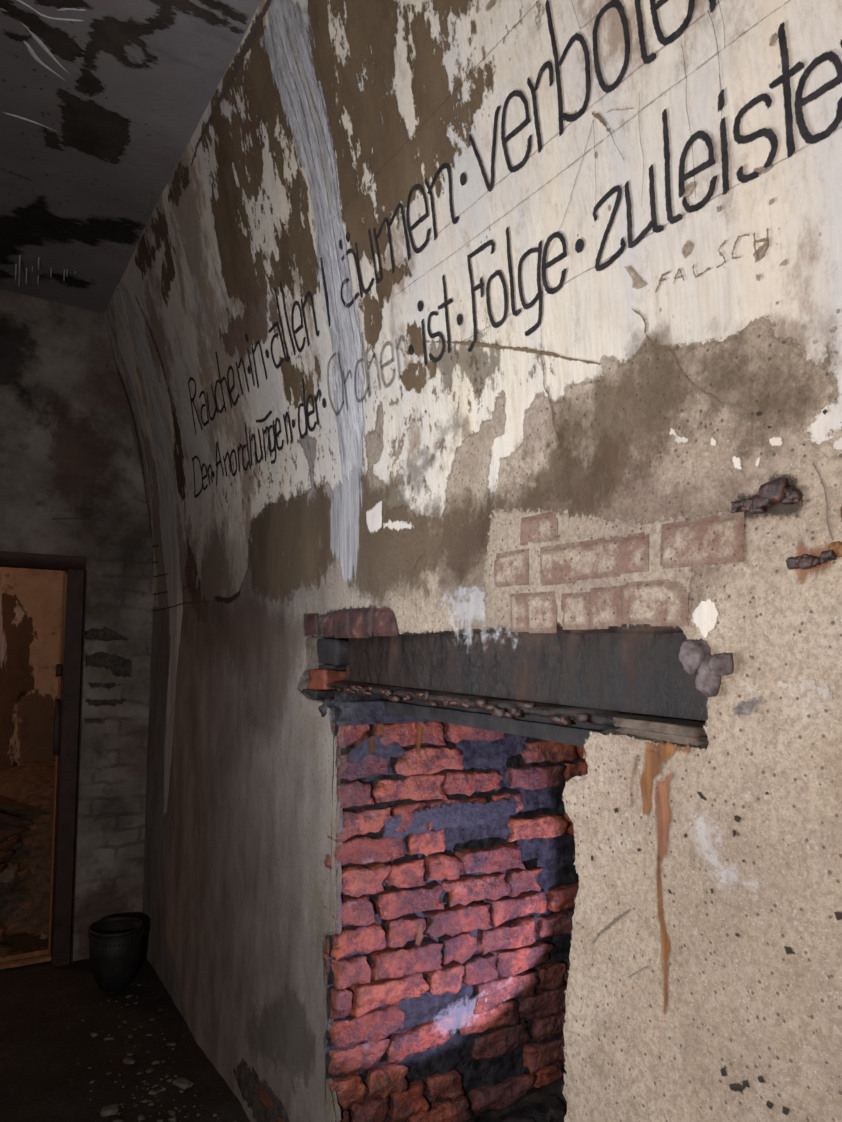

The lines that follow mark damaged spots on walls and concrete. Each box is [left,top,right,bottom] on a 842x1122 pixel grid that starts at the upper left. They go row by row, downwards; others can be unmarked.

peeling [453,0,544,130]
leakage [0,160,190,309]
leakage [201,0,688,605]
corrosion [735,475,801,519]
corrosion [797,541,842,582]
peeling [141,316,842,1122]
corrosion [640,742,690,1014]